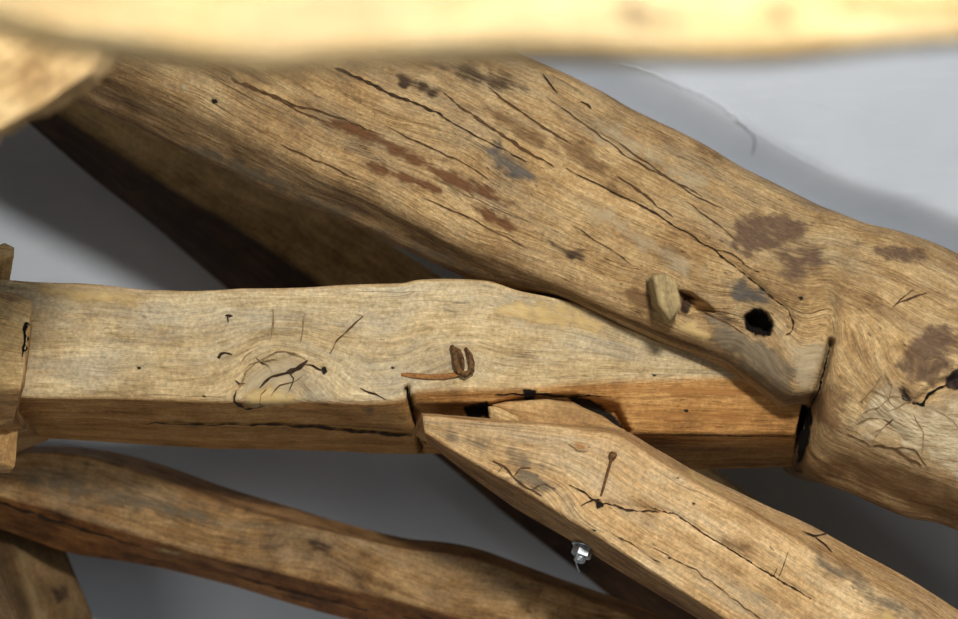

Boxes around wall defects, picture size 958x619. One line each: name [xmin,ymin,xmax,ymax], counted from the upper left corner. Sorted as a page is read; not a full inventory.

crack [231,77,498,186]
crack [335,67,794,335]
crack [139,358,411,437]
crack [847,372,958,470]
crack [493,460,811,599]
crack [609,530,761,619]